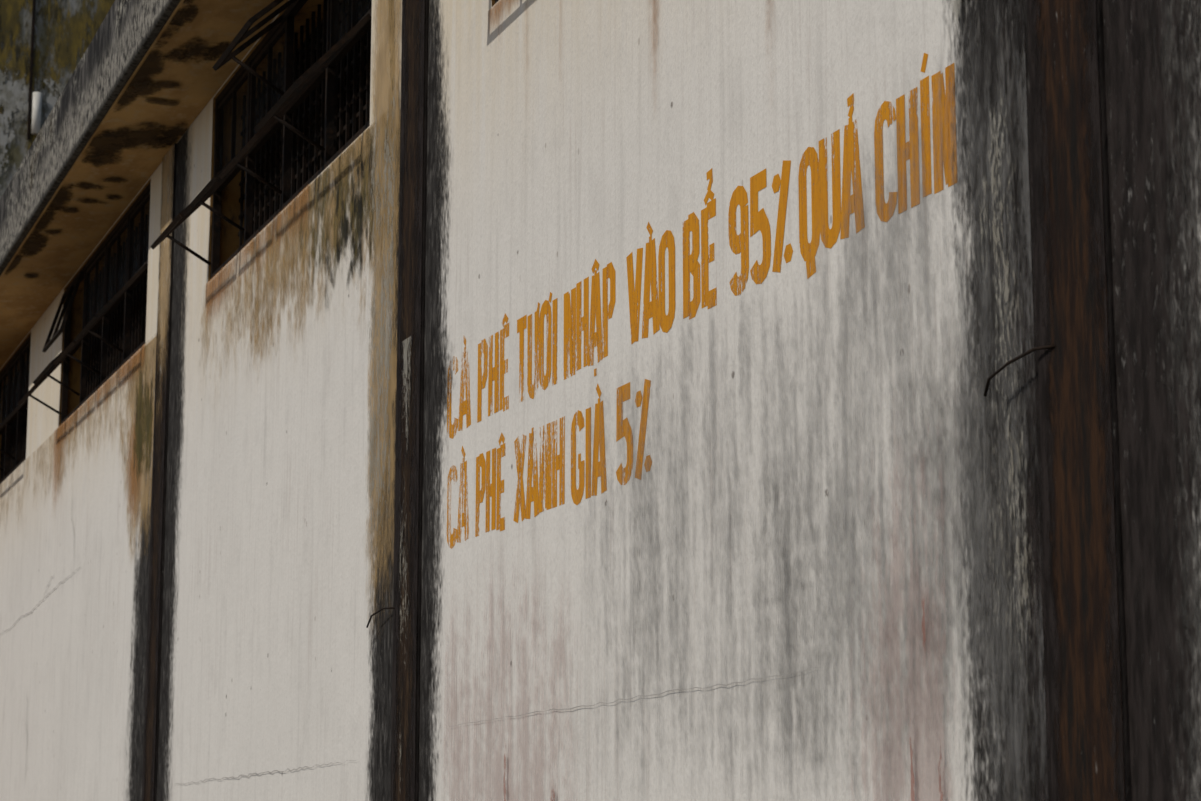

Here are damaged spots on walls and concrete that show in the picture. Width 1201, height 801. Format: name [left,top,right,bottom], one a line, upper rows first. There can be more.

water stain [6,122,190,801]
water stain [117,0,230,111]
water stain [239,0,452,801]
water stain [953,0,1201,801]